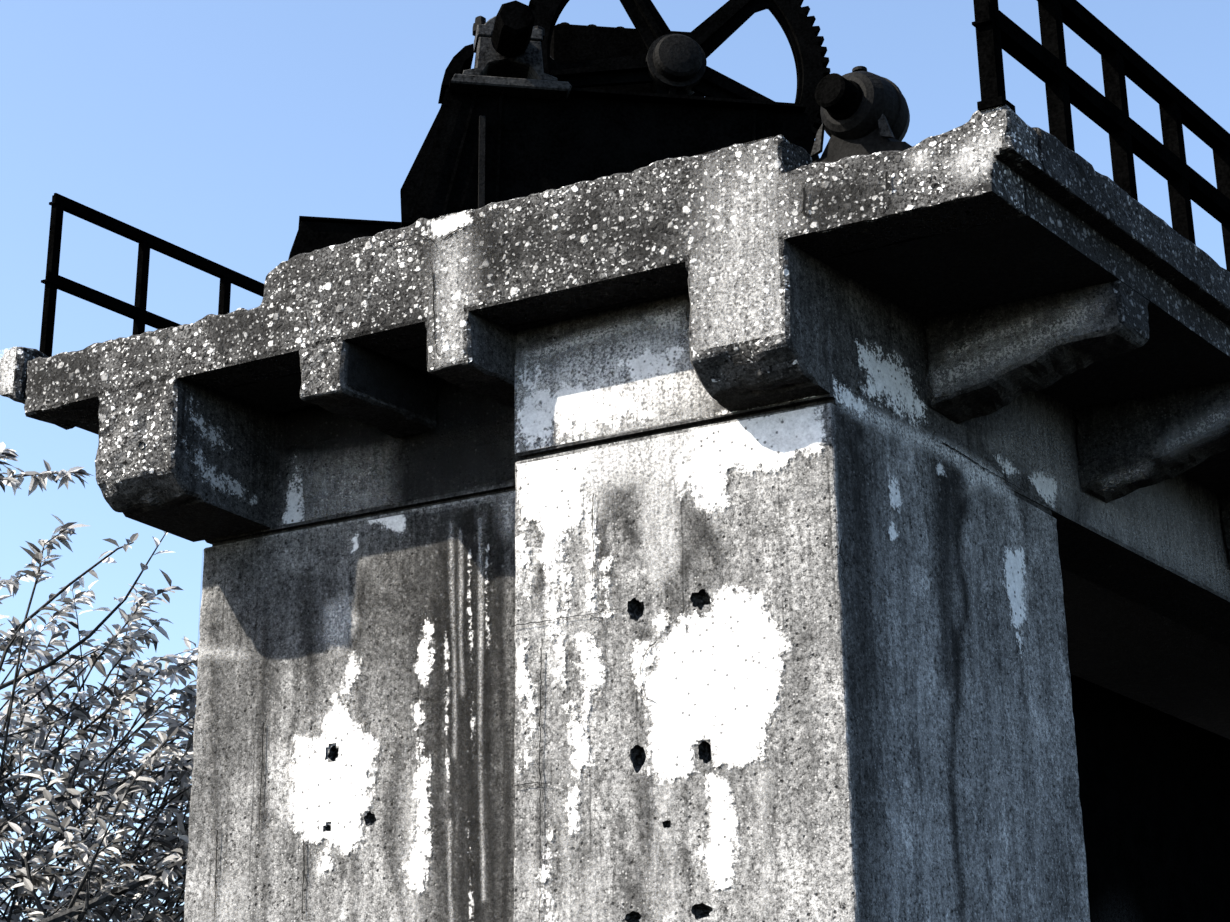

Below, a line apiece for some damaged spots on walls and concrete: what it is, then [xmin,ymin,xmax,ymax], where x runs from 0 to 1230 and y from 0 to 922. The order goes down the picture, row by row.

peeling [673,396,826,513]
water stain [278,311,699,922]
water stain [833,341,1057,874]
peeling [1002,547,1027,658]
peeling [288,651,380,874]
peeling [627,584,790,920]
water stain [951,778,963,911]